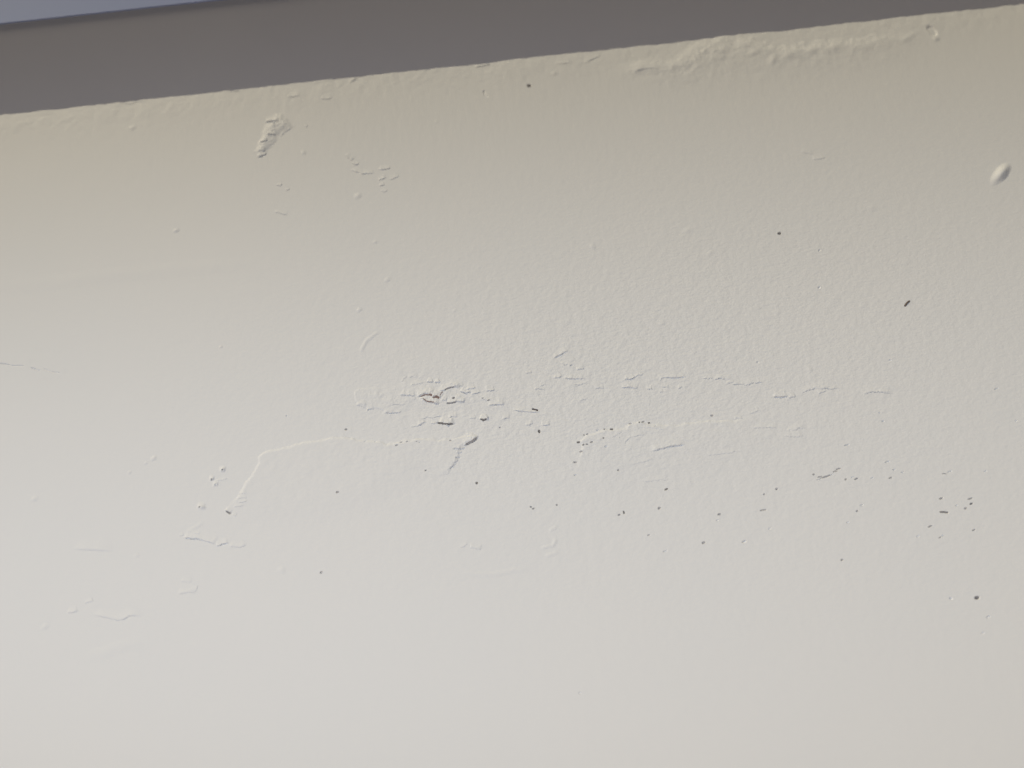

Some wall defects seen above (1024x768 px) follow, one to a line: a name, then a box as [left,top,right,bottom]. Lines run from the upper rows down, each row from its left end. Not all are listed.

peeling [354,371,550,433]